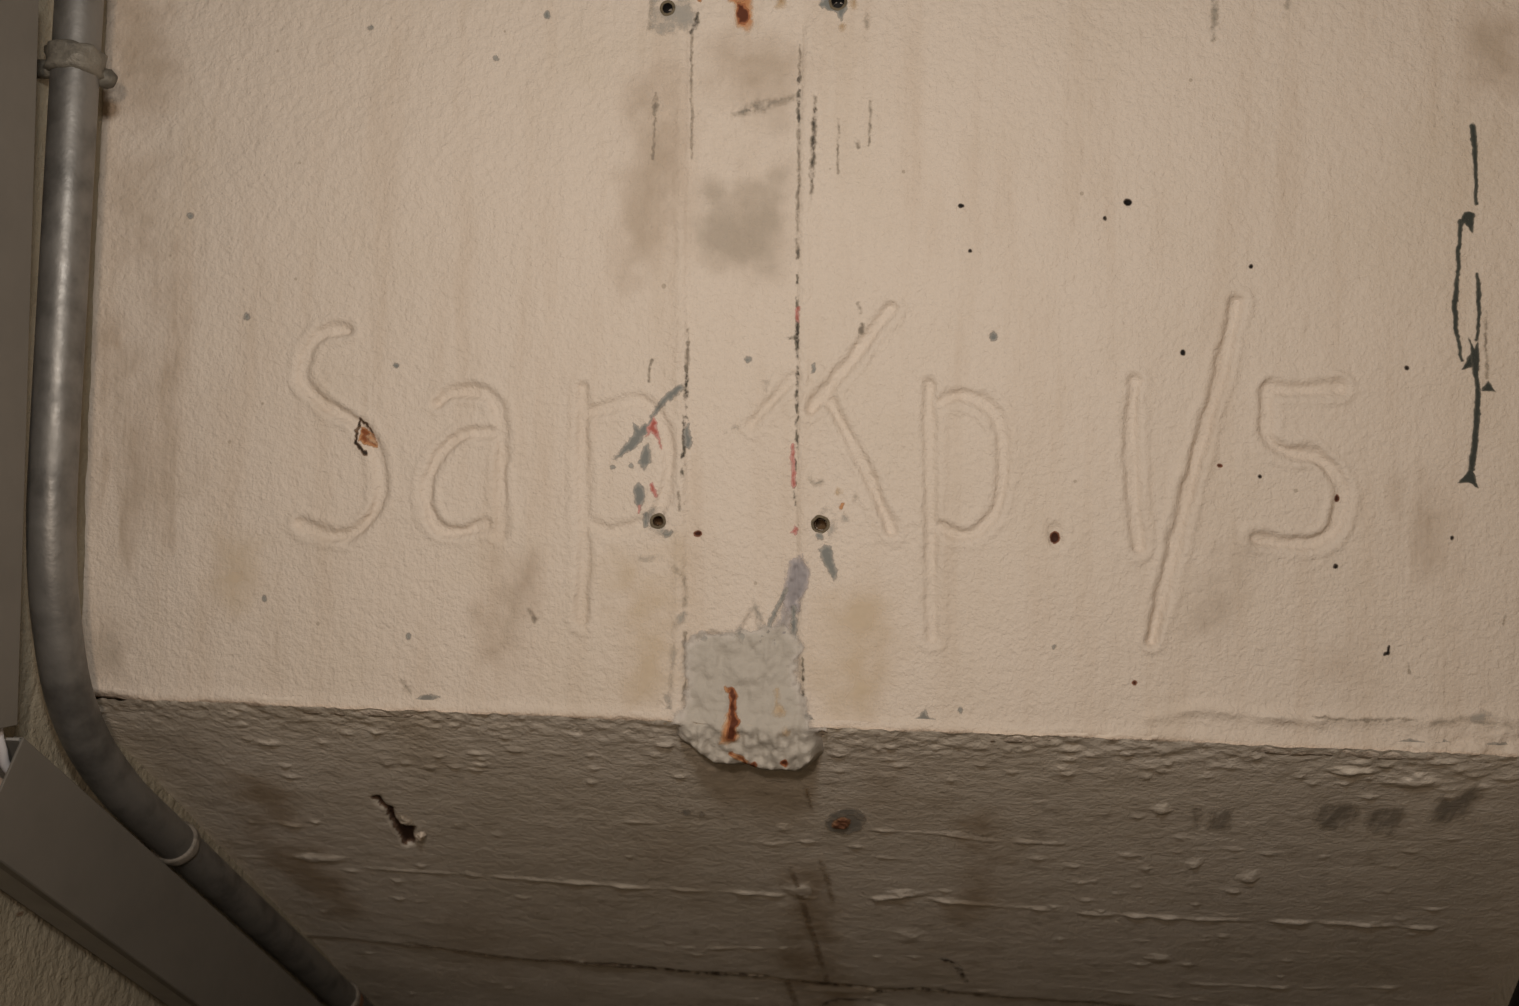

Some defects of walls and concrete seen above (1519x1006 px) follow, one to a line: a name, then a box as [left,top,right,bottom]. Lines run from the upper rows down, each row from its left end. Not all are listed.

corrosion [729,0,753,31]
spalling [654,481,846,772]
spalling [371,795,426,845]
crack [414,861,1126,1006]